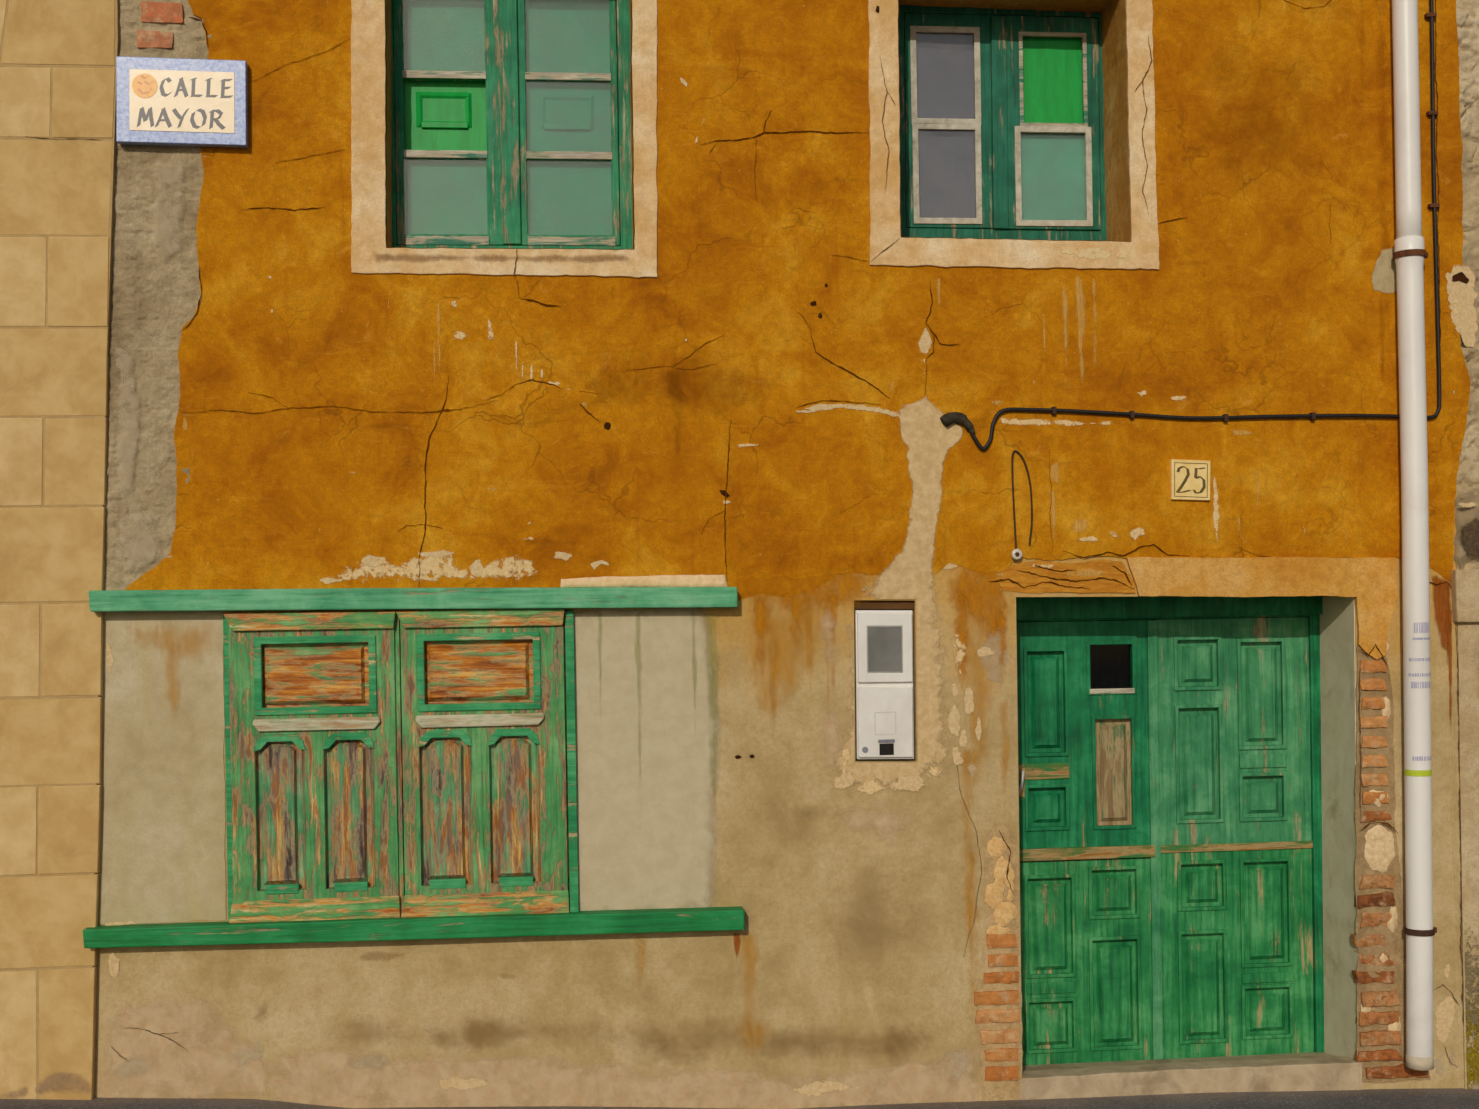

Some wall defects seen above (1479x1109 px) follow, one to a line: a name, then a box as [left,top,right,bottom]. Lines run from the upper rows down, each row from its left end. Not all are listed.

spalling [118,0,212,59]
crack [705,59,895,200]
spalling [104,141,206,590]
crack [513,250,557,307]
peeling [796,404,900,417]
crack [796,288,959,408]
spalling [1445,264,1478,347]
peeling [320,550,537,584]
peeling [833,627,994,795]
spalling [1351,641,1431,1083]
spalling [974,823,1023,1101]
water stain [1465,931,1479,1037]